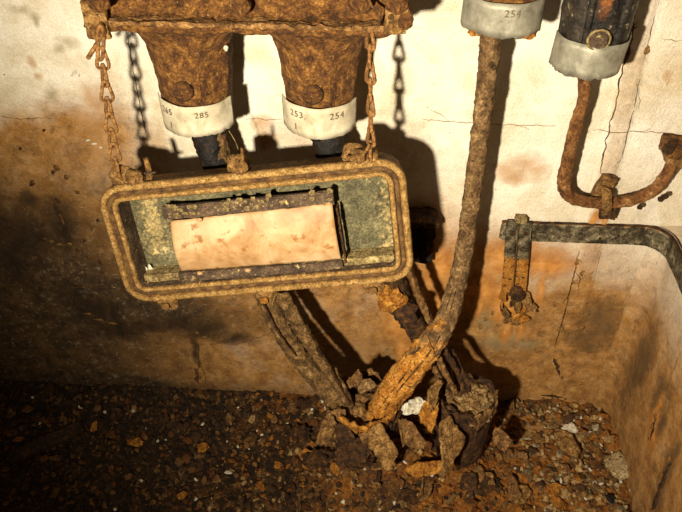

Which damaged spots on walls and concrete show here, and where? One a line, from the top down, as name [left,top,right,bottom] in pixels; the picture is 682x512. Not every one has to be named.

crack [598,1,682,174]
rust [464,246,516,339]
rust [528,255,572,303]
crack [554,252,601,348]